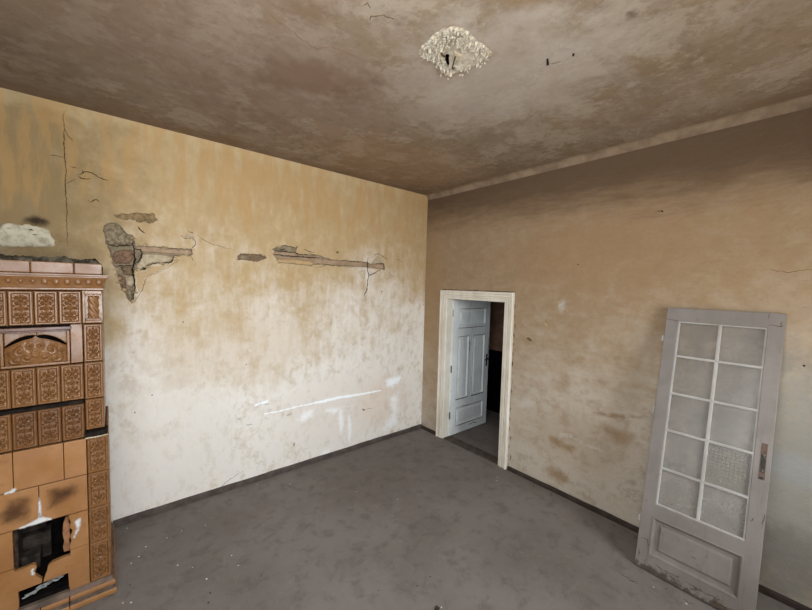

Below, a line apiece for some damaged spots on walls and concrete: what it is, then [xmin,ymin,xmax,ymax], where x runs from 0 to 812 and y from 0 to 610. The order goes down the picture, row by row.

crack [53,110,105,237]
spalling [100,213,194,304]
spalling [236,245,387,270]